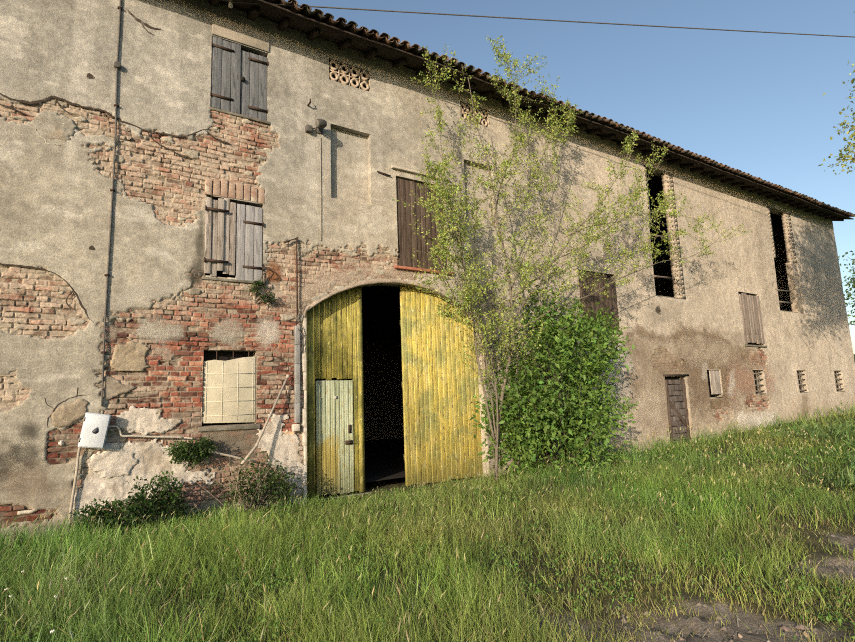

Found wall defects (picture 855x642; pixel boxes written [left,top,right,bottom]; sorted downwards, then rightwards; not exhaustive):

crack [127,9,162,35]
spalling [0,98,279,227]
spalling [0,241,424,528]
damp [607,344,642,399]
damp [736,413,777,429]
spalling [744,393,770,413]